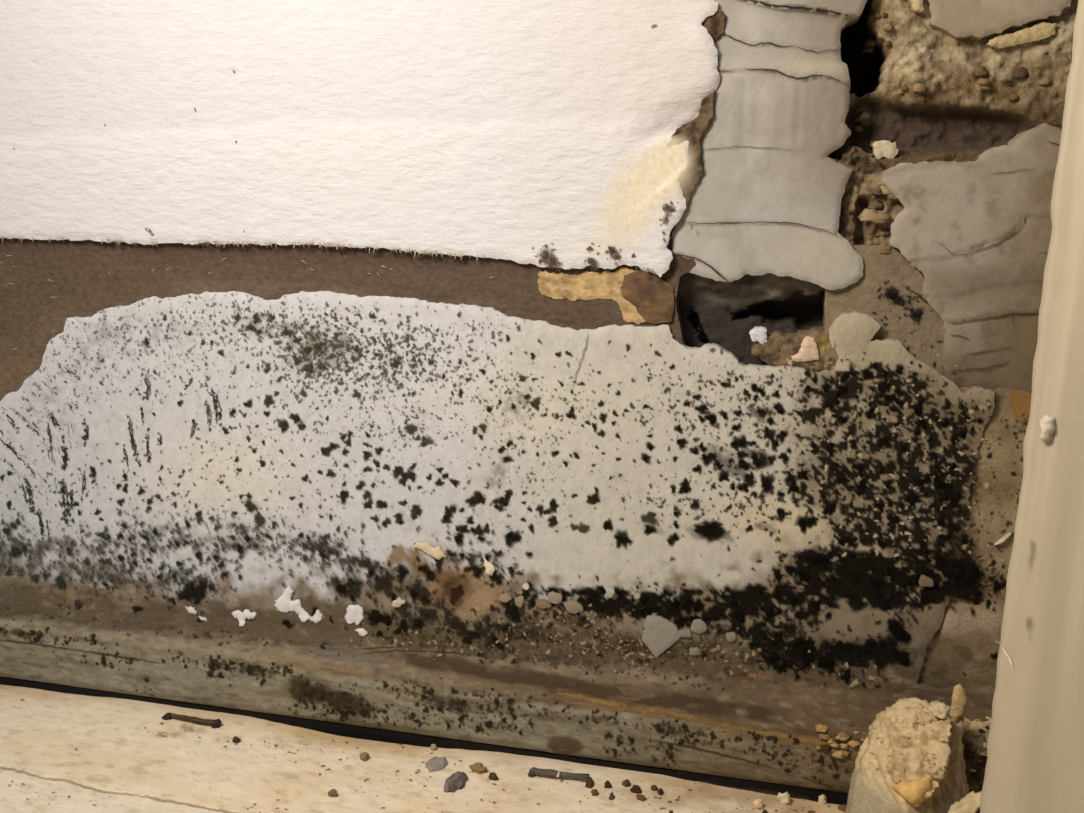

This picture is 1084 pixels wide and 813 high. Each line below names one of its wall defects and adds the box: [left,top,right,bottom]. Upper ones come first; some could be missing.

flaking render [0,0,1078,401]
water stain [0,280,1029,789]